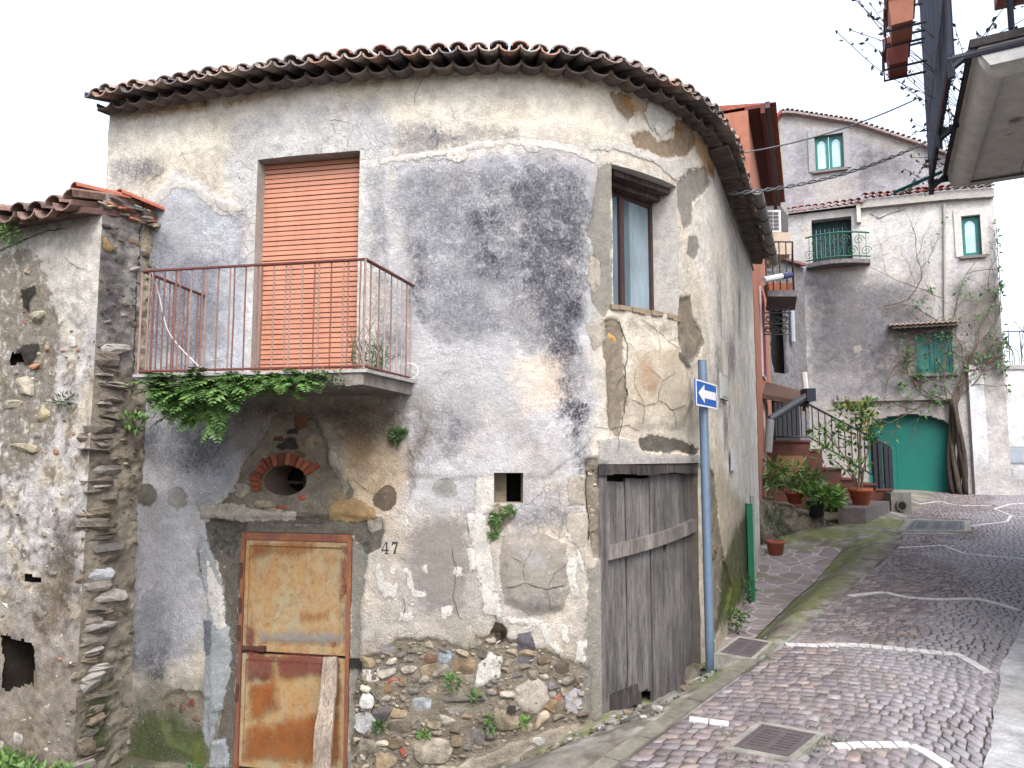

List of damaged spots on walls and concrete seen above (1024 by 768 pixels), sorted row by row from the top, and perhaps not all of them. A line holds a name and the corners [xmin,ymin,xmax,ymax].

flaking render [147,177,243,217]
damp [405,159,590,383]
spalling [378,91,710,436]
spalling [0,243,63,479]
crack [595,320,686,453]
spalling [639,434,699,455]
spalling [160,412,589,768]
corrosion [246,678,317,760]
corrosion [332,683,340,759]